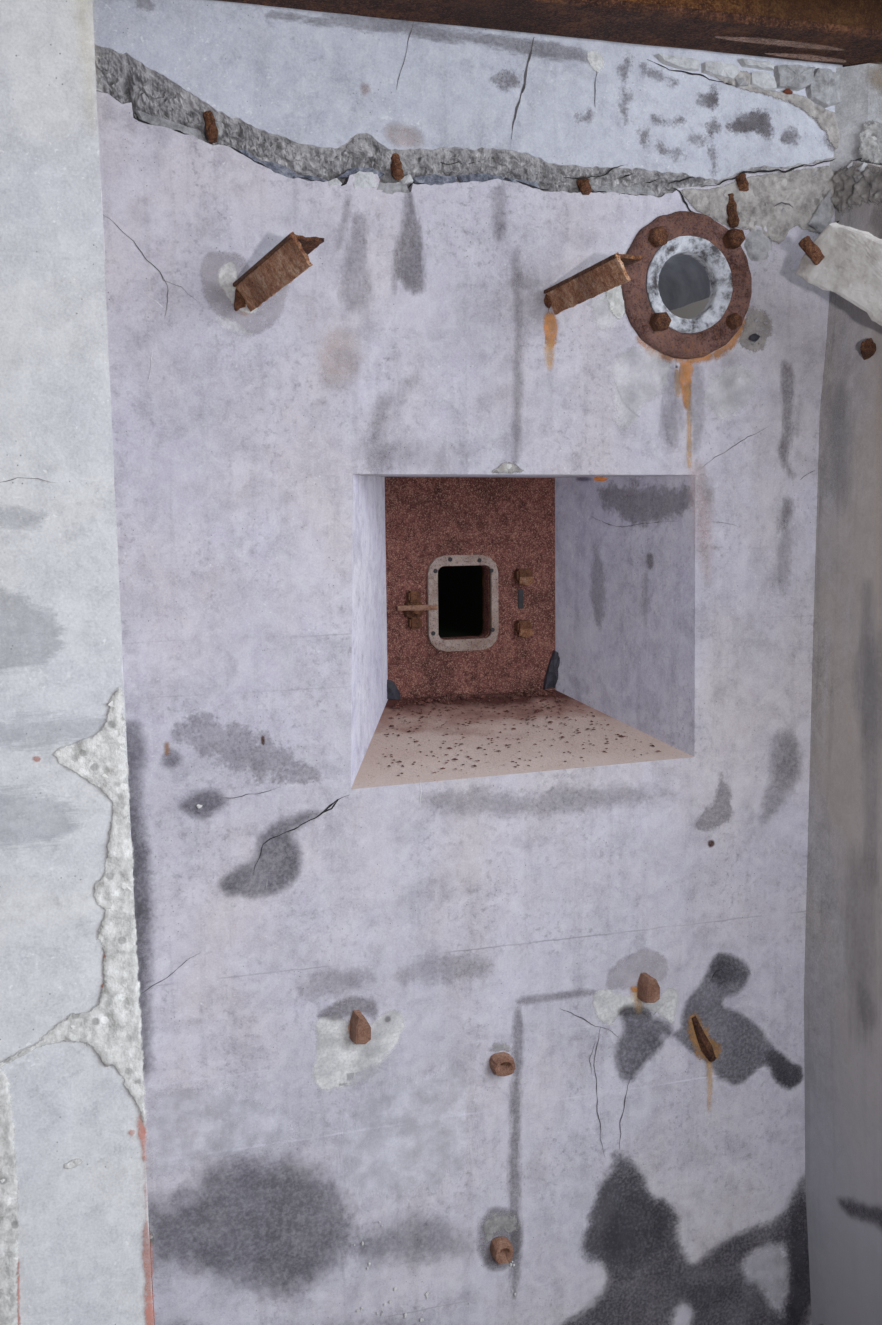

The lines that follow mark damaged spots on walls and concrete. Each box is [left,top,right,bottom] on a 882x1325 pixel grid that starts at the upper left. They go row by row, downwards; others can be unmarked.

spalling [203,111,219,143]
spalling [390,153,404,181]
crack [95,38,882,212]
damp [400,195,422,289]
rust [544,313,557,365]
crack [253,795,348,874]
spalling [0,687,148,1325]
crack [561,1009,630,1152]
rust [688,1015,721,1082]
damp [619,954,801,1086]
damp [156,1167,338,1284]
damp [565,1158,811,1325]